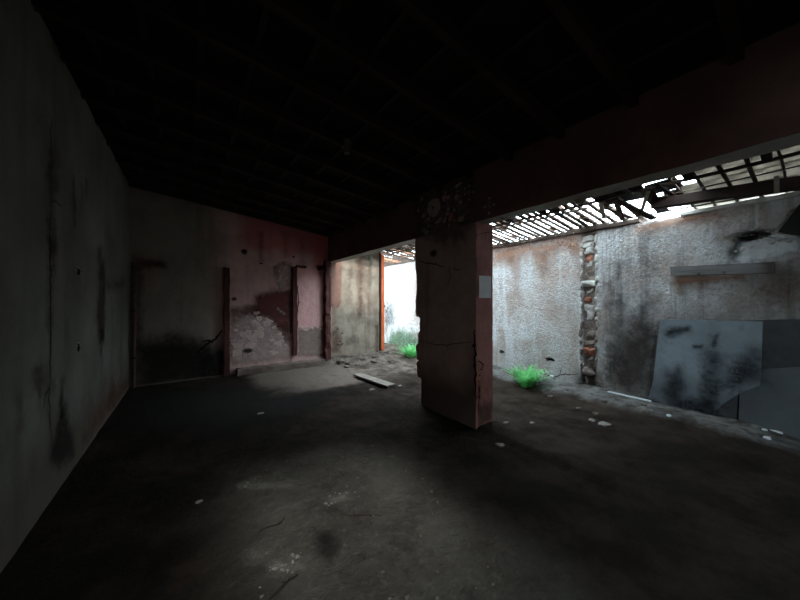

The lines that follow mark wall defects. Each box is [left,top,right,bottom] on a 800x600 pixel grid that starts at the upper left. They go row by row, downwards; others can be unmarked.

leakage [729,236,756,256]
leakage [233,290,292,340]
flaking render [230,311,324,363]
crack [426,330,484,395]
flaking render [578,233,599,384]
leakage [610,326,657,403]